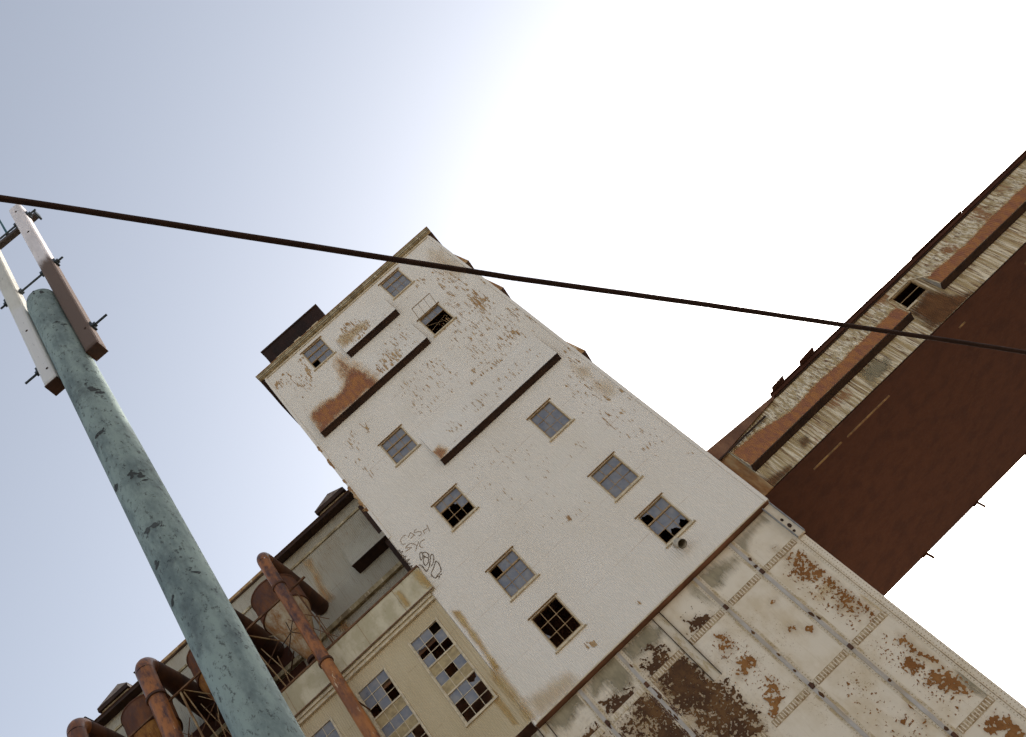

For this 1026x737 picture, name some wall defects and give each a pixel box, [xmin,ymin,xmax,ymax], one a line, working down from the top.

peeling [339,314,385,345]
peeling [375,324,418,376]
peeling [275,357,315,398]
corrosion [311,359,377,432]